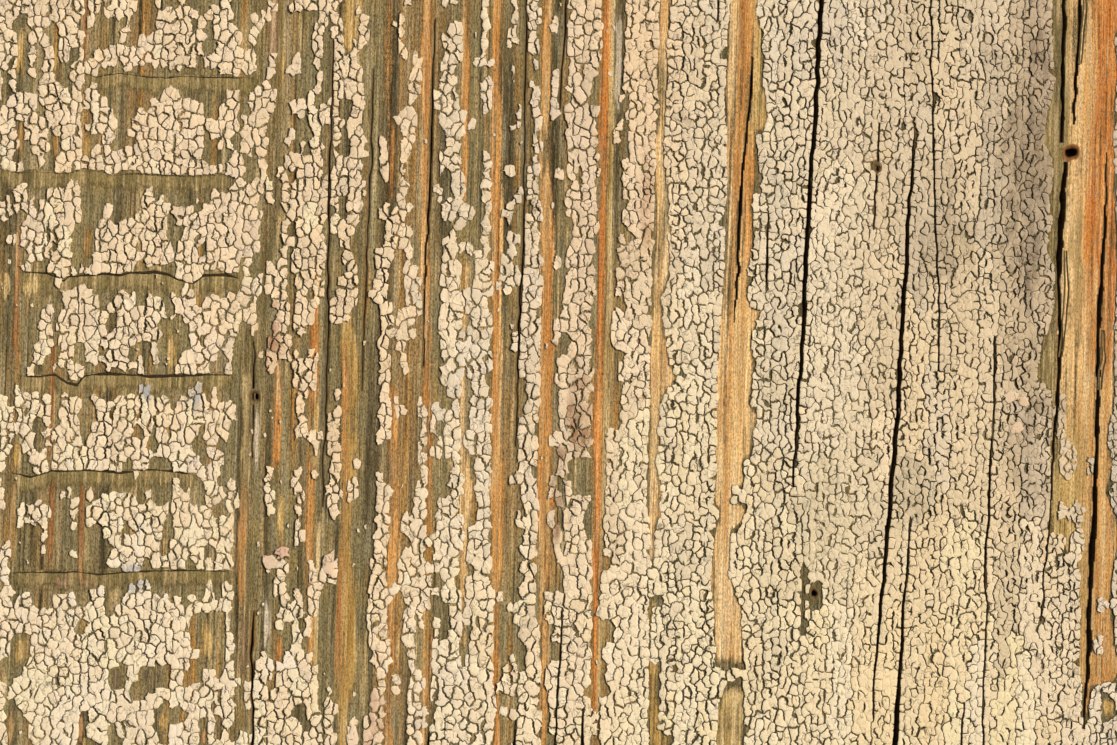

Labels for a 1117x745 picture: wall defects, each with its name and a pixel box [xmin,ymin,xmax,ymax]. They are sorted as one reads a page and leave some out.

crack [12,568,227,576]
peeling [0,0,370,745]
peeling [346,0,1117,745]
crack [732,58,770,323]
crack [790,0,825,487]
crack [872,0,941,745]
crack [1039,0,1088,621]
crack [1081,152,1108,729]